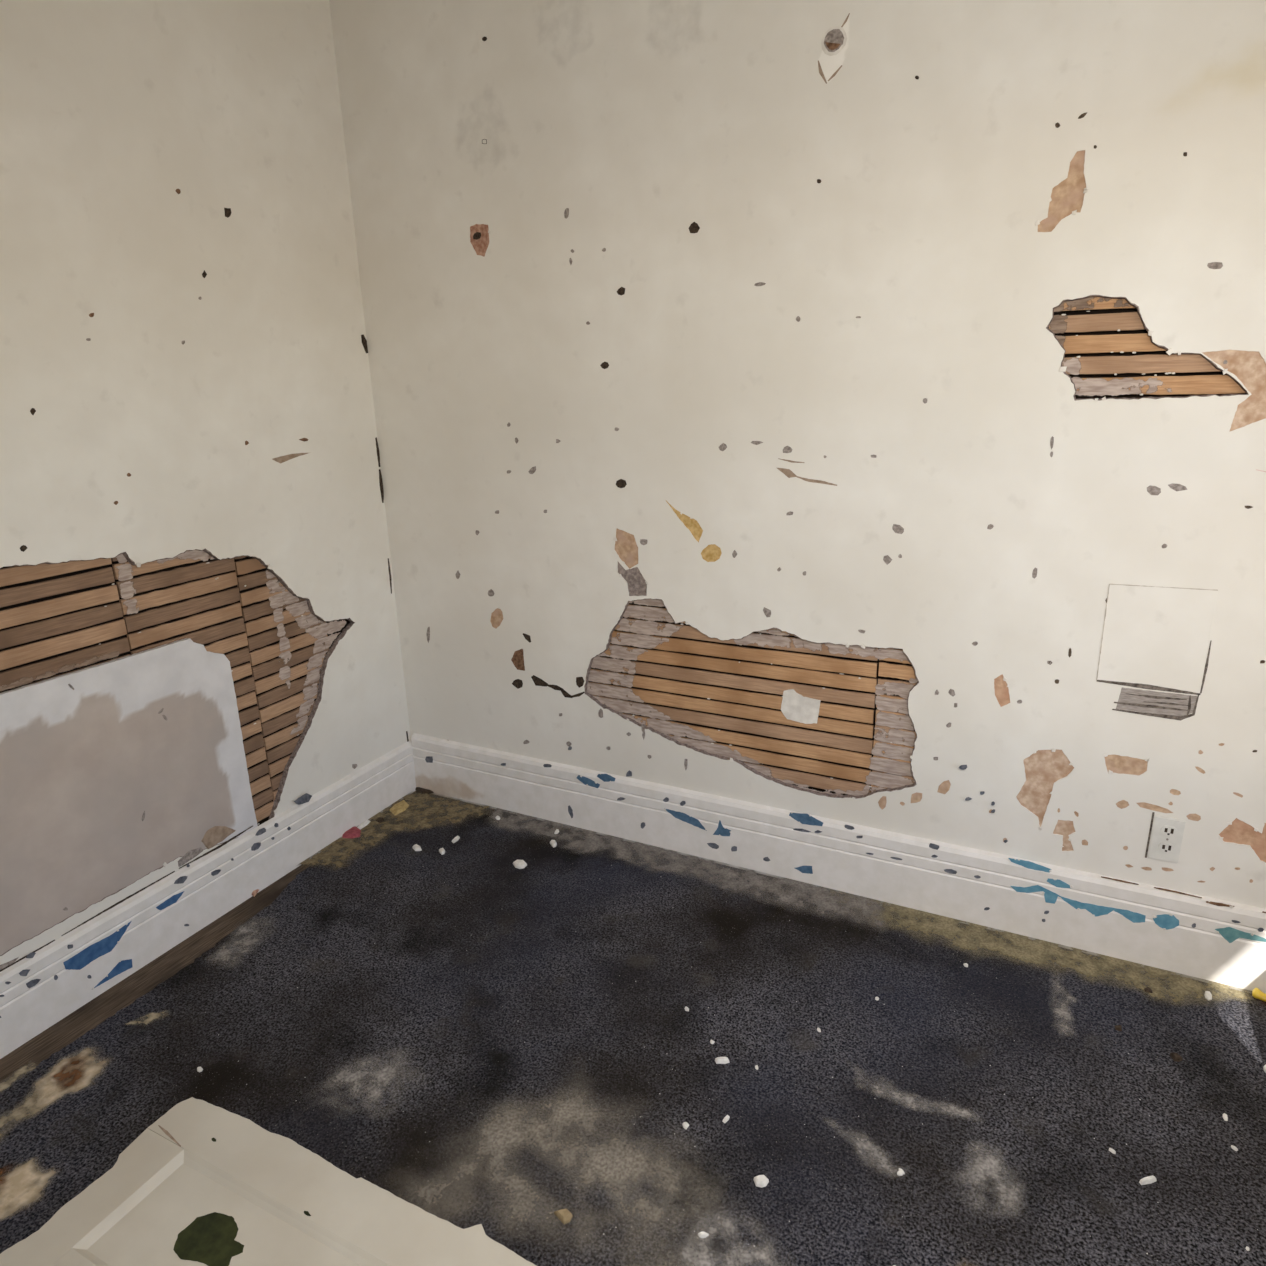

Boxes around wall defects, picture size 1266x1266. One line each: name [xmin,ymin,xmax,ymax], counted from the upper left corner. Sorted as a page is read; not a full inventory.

spalling [1035,145,1097,232]
spalling [0,548,355,851]
spalling [577,529,922,810]
peeling [789,812,823,833]
peeling [937,780,951,794]
spalling [1016,748,1088,851]
spalling [1219,818,1266,862]
peeling [0,826,238,997]
peeling [1008,858,1196,930]
peeling [1206,901,1266,943]